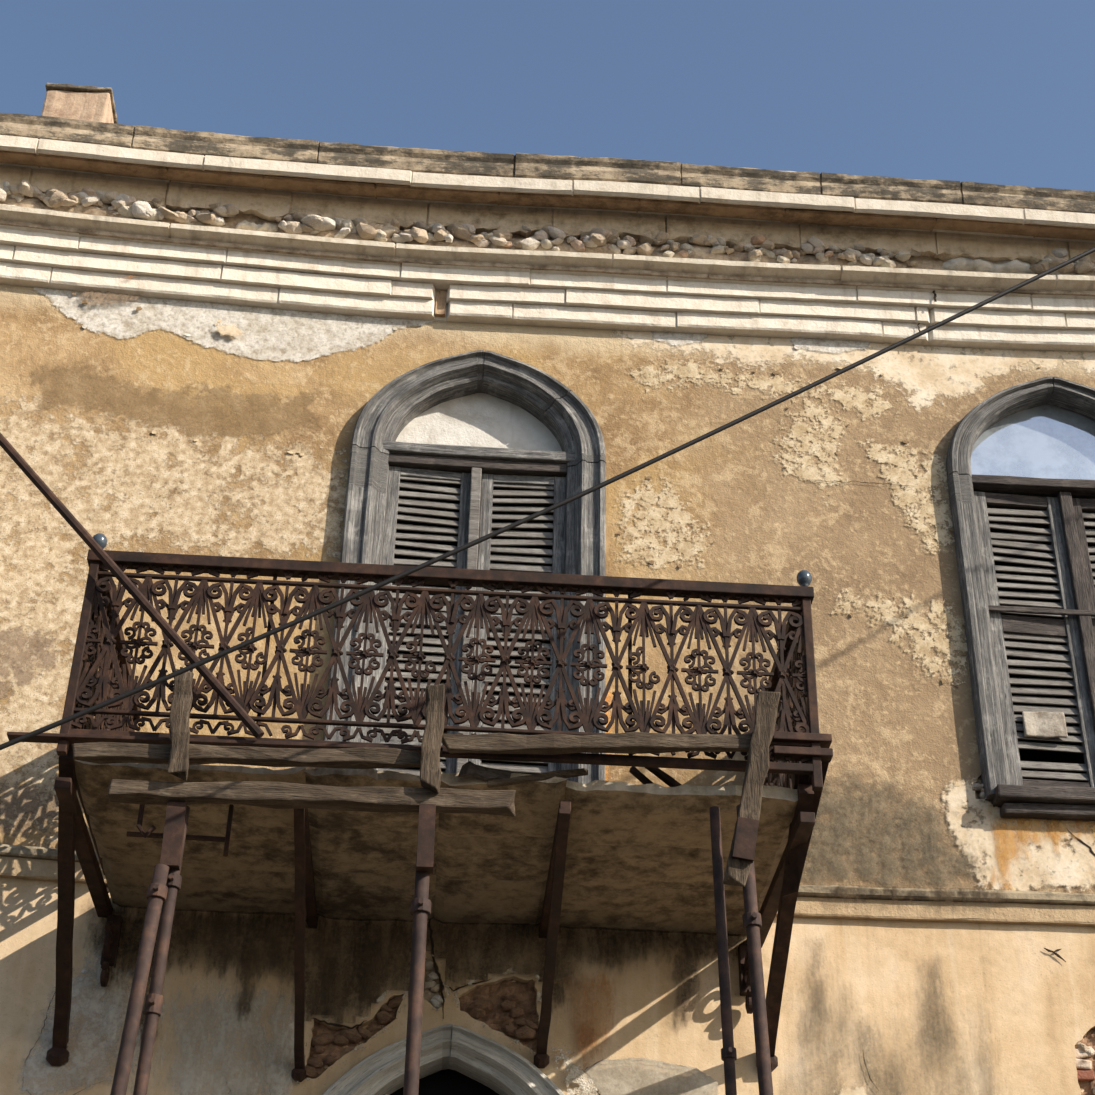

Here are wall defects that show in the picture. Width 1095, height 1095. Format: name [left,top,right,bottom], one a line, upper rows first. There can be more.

flaking render [34,287,434,362]
flaking render [609,330,1095,555]
flaking render [0,385,348,848]
flaking render [826,586,969,687]
damp [802,772,1002,901]
flaking render [942,777,1095,893]
flaking render [297,990,407,1082]
flaking render [423,953,542,1054]
flaking render [552,1047,603,1095]
damp [675,953,698,1024]
flaking render [834,1086,866,1095]
flaking render [1075,1029,1095,1095]